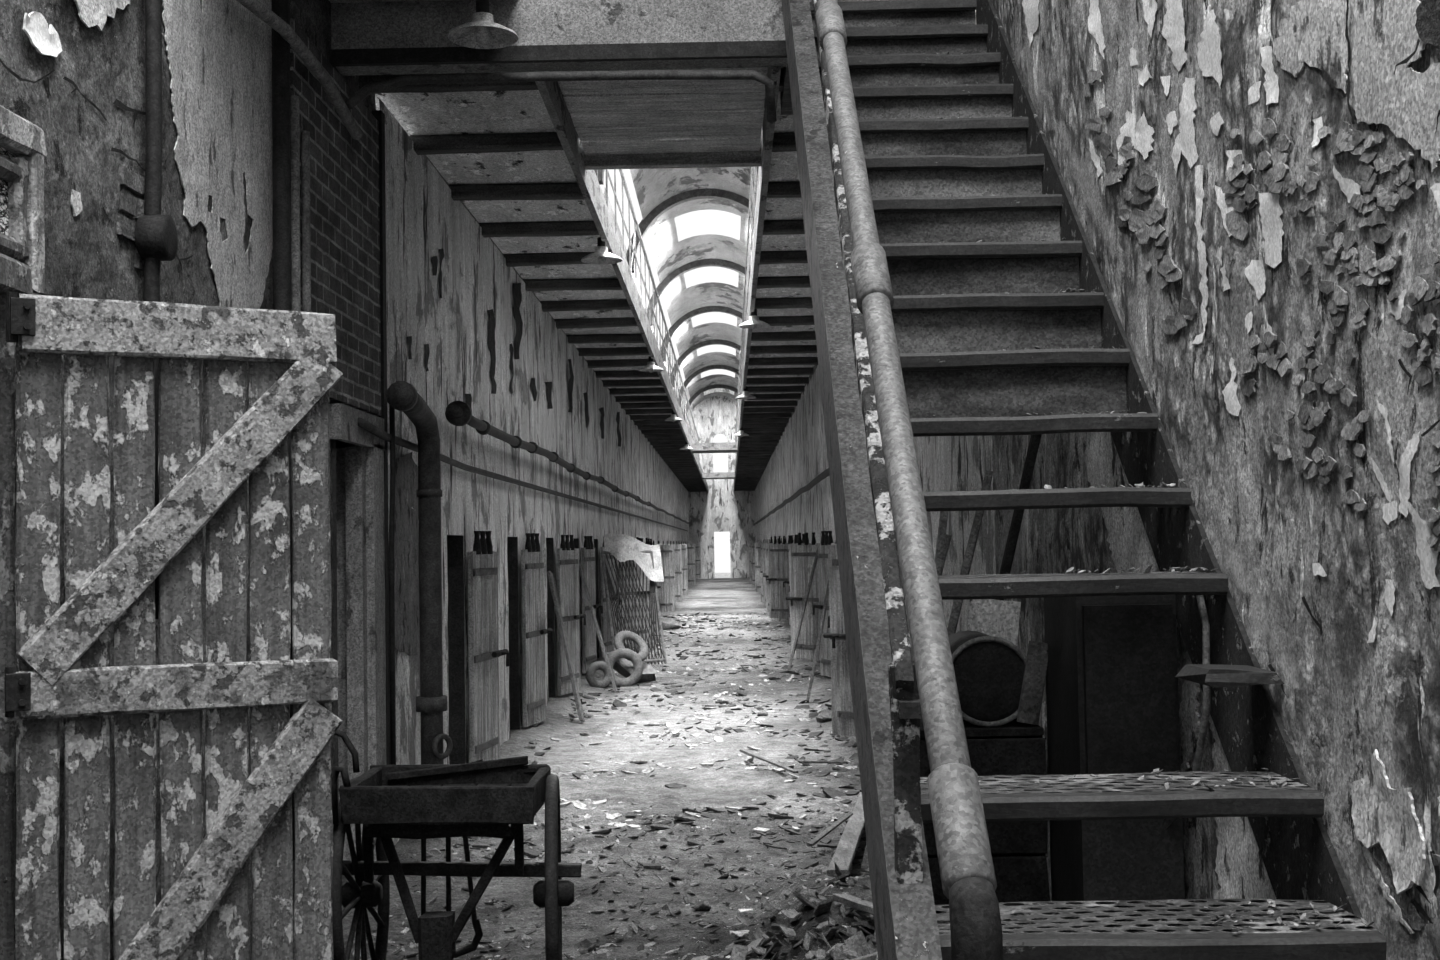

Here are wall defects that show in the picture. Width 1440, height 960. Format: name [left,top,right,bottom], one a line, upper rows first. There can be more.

flaking render [23,12,62,57]
peeling [1022,0,1039,45]
peeling [1079,0,1440,589]
peeling [1367,579,1395,643]
flaking render [1179,650,1234,785]
spalling [1373,845,1427,930]
spalling [1432,854,1440,907]